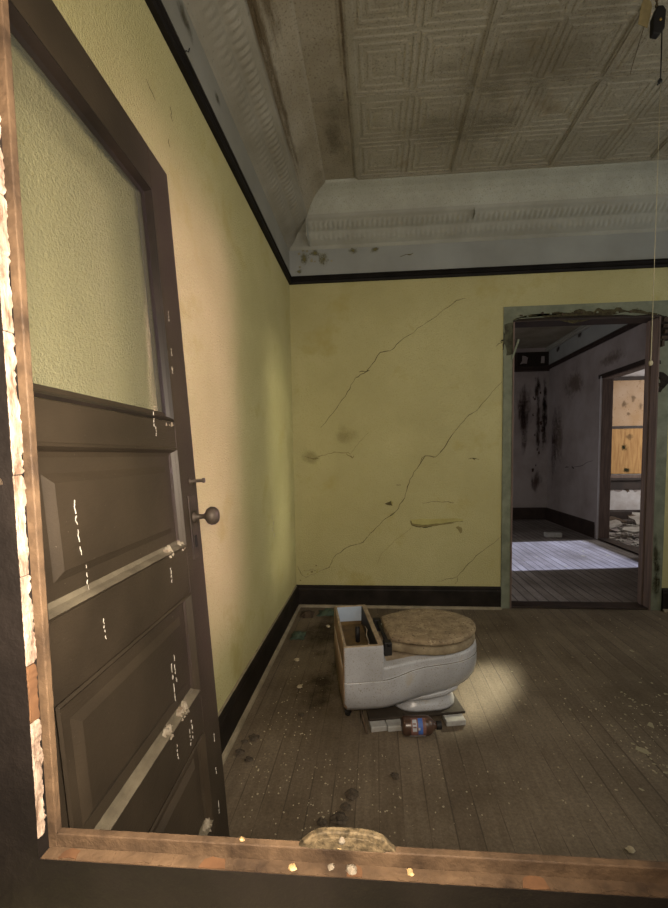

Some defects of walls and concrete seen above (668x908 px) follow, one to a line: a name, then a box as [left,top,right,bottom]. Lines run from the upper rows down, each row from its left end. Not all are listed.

crack [323,298,464,425]
crack [298,382,502,578]
damp [518,380,557,462]
spalling [498,307,668,366]